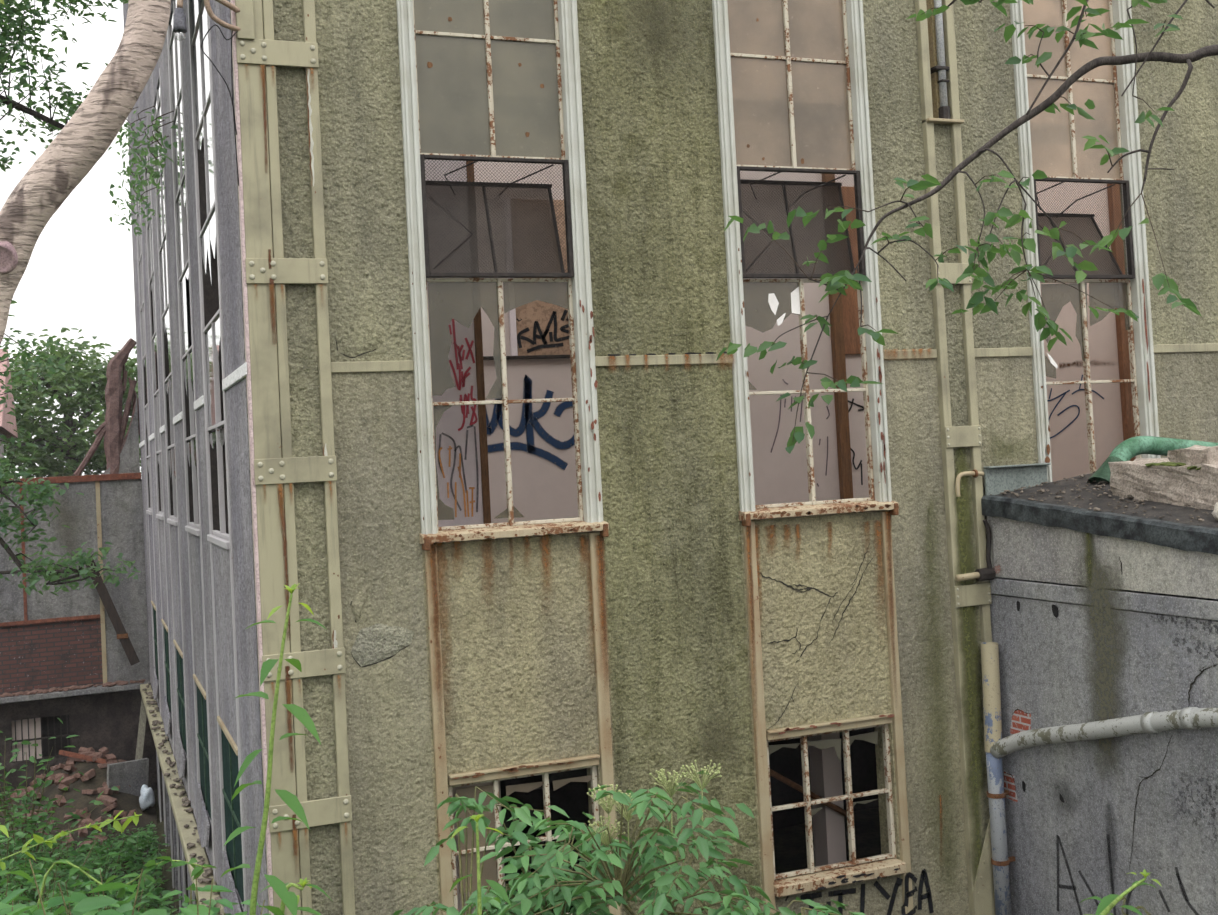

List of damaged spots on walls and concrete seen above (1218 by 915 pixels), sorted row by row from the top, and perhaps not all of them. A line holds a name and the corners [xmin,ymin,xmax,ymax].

rust [246,64,274,167]
rust [254,249,283,343]
rust [263,483,292,635]
rust [509,534,550,572]
rust [271,666,300,770]
crack [759,546,873,727]
flaking render [1010,709,1031,735]
water stain [1083,533,1125,722]
water stain [1094,737,1116,766]
crack [1188,664,1217,702]
crack [1129,737,1171,870]